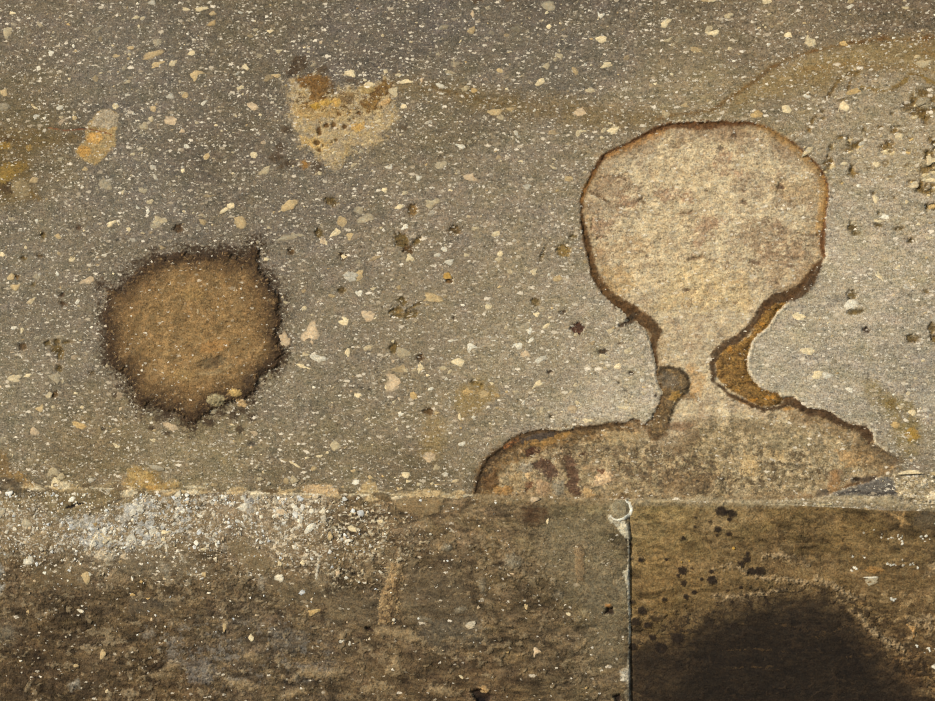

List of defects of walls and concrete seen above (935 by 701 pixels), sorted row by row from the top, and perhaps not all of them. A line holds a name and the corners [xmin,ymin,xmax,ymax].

spalling [321,194,341,208]
spalling [361,95,935,698]
water stain [813,468,935,578]